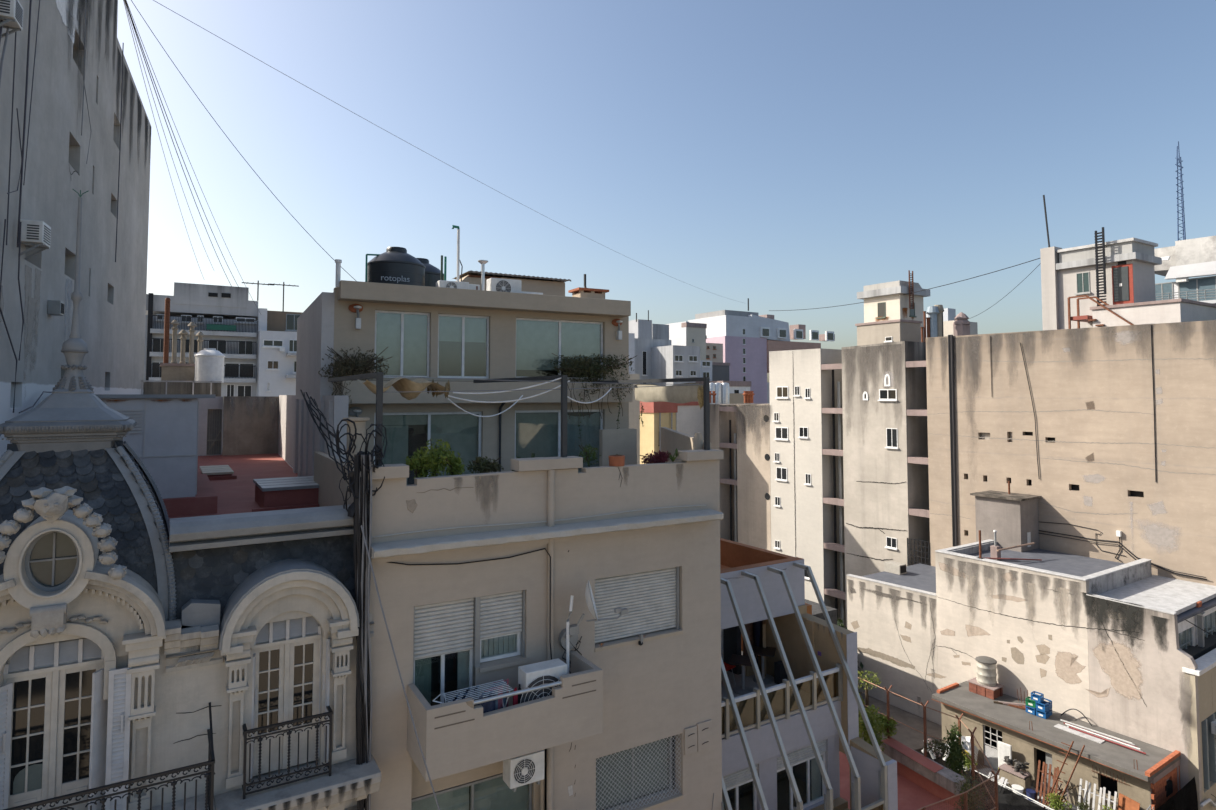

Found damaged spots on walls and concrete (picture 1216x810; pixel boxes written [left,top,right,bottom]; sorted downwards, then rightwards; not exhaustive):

water stain [69,0,151,151]
water stain [928,330,1049,380]
water stain [1064,328,1087,354]
water stain [1105,324,1151,343]
water stain [848,579,935,626]
water stain [946,558,1167,647]
spalling [941,625,990,636]